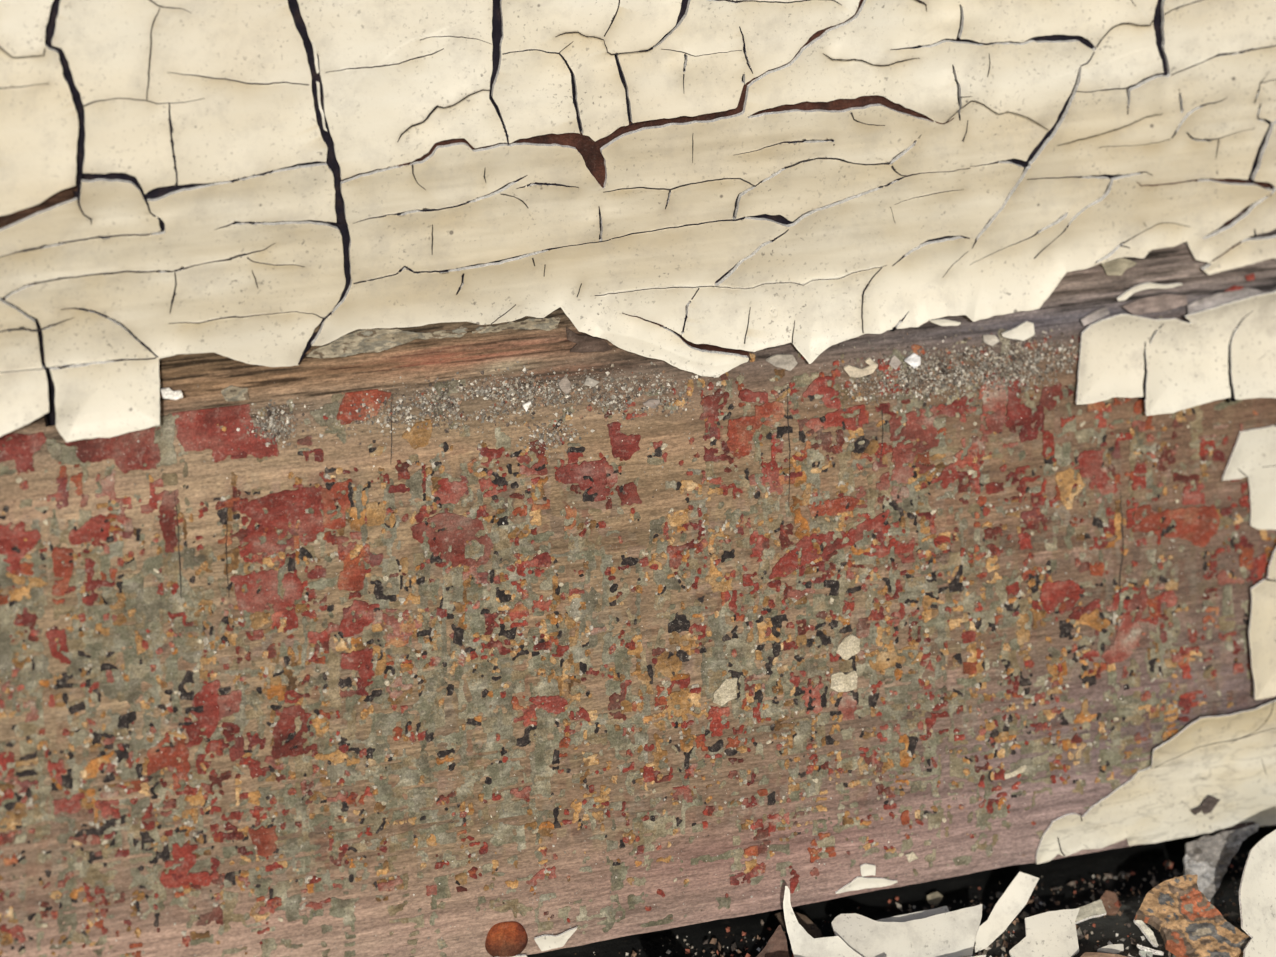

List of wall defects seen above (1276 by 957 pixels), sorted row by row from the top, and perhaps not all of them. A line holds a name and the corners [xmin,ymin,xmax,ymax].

crack [0,0,1276,427]
peeling [1101,258,1137,275]
crack [1117,490,1125,609]
peeling [0,273,1276,957]
crack [1155,705,1276,773]